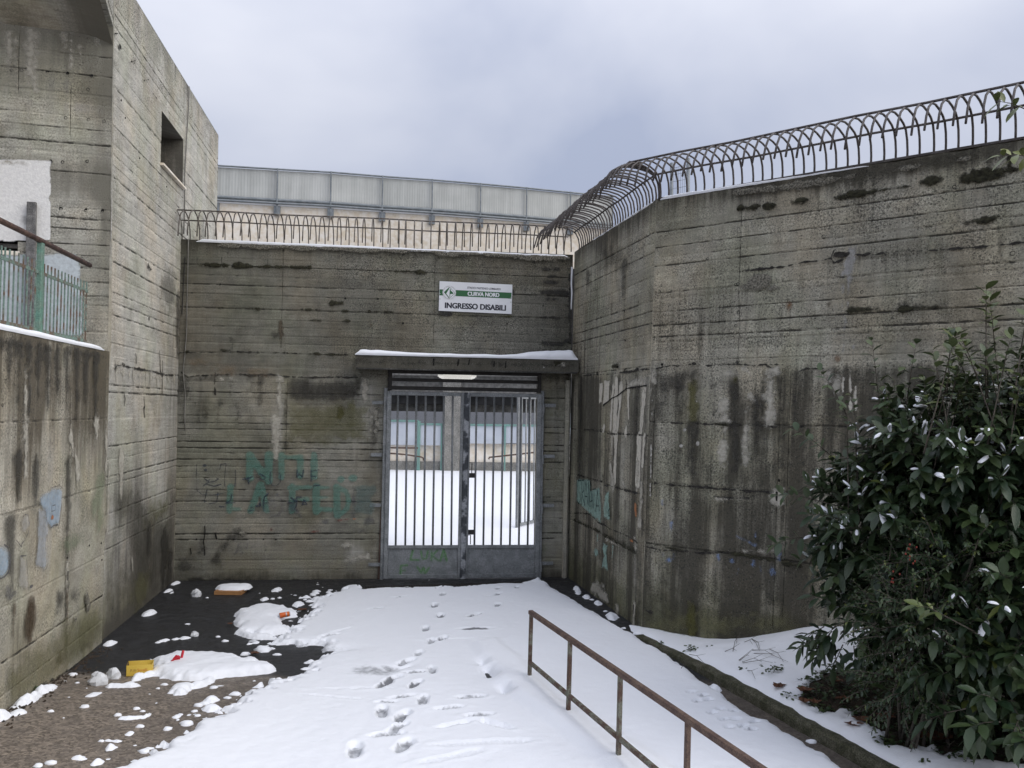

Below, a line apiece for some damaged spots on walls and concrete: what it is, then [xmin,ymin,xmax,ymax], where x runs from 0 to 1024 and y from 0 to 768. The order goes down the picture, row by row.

damp [0,339,124,555]
damp [599,371,694,552]
damp [713,376,782,471]
damp [825,372,858,411]
damp [7,516,15,577]